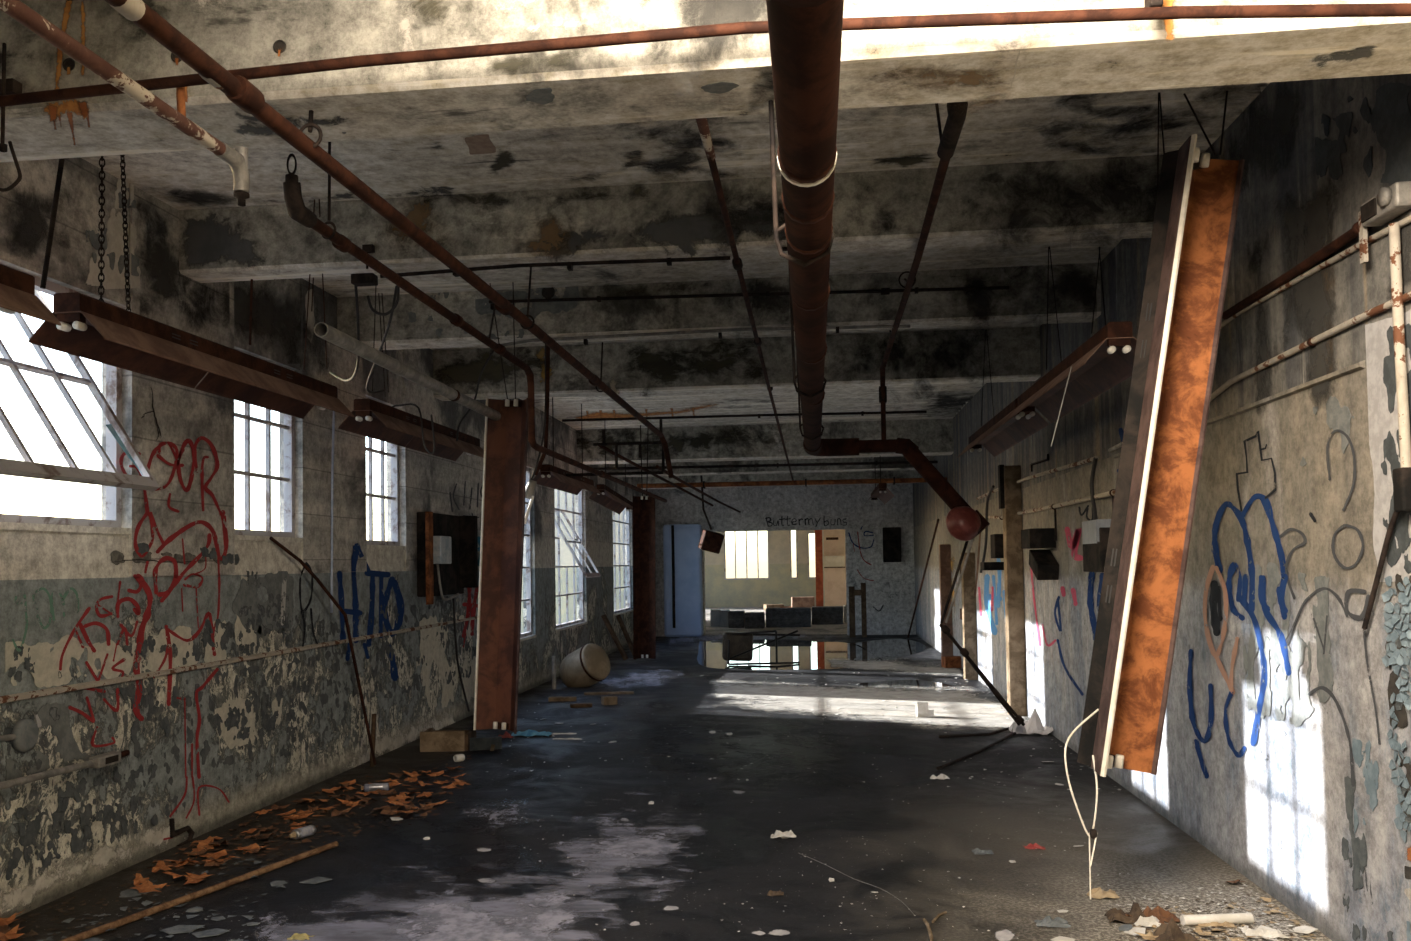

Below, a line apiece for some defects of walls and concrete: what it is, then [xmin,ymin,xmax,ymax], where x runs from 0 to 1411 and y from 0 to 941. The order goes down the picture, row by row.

rust [44,48,90,145]
damp [136,188,332,380]
damp [527,123,786,259]
damp [874,154,934,167]
damp [884,68,1003,108]
damp [995,81,1302,250]
damp [1247,181,1339,413]
damp [1312,46,1375,67]
damp [1389,218,1411,293]
damp [610,339,767,397]
peeling [1313,309,1411,941]
peeling [3,543,477,880]